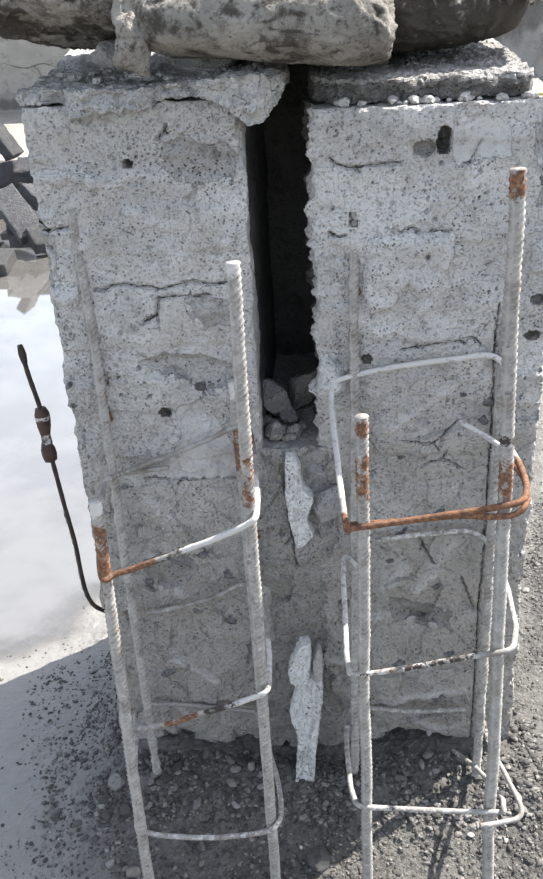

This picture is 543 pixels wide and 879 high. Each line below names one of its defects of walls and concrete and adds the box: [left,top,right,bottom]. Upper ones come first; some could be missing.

crack [98,280,228,322]
crack [402,303,500,388]